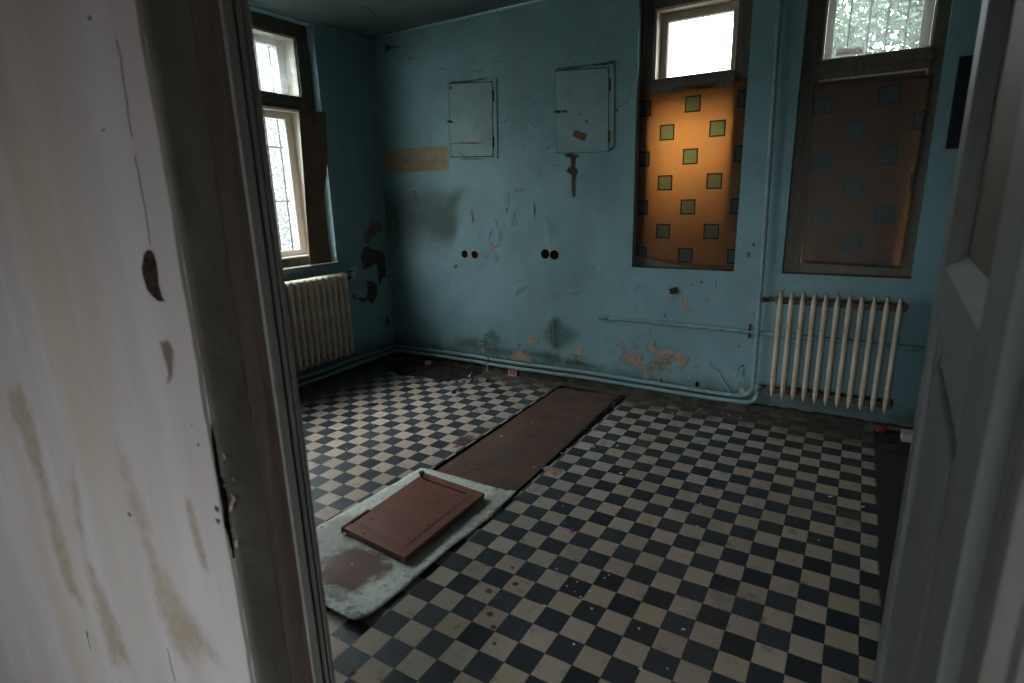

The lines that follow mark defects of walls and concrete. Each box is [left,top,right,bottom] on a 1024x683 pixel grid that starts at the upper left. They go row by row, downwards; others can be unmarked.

corrosion [565,153,578,197]
peeling [352,216,387,304]
peeling [618,337,690,383]
spalling [214,453,237,524]